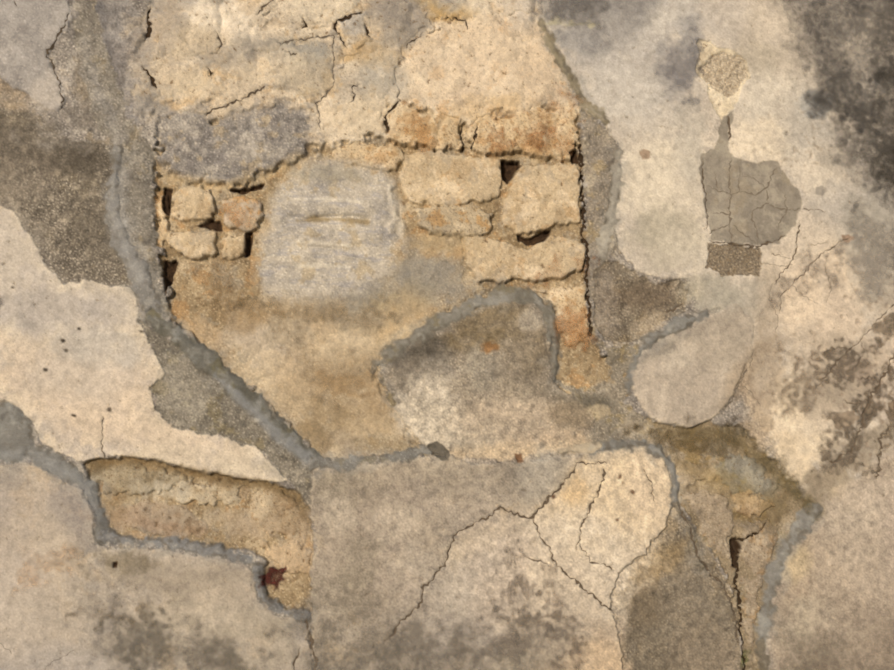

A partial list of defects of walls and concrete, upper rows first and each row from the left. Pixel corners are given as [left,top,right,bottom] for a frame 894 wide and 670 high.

crack [206,86,265,116]
crack [277,12,370,129]
crack [384,100,401,133]
spalling [695,39,751,120]
water stain [805,0,894,180]
spalling [132,0,689,463]
crack [577,144,593,336]
peeling [706,243,763,277]
crack [702,116,850,331]
spalling [91,320,314,612]
crack [385,461,613,641]
crack [678,504,766,670]